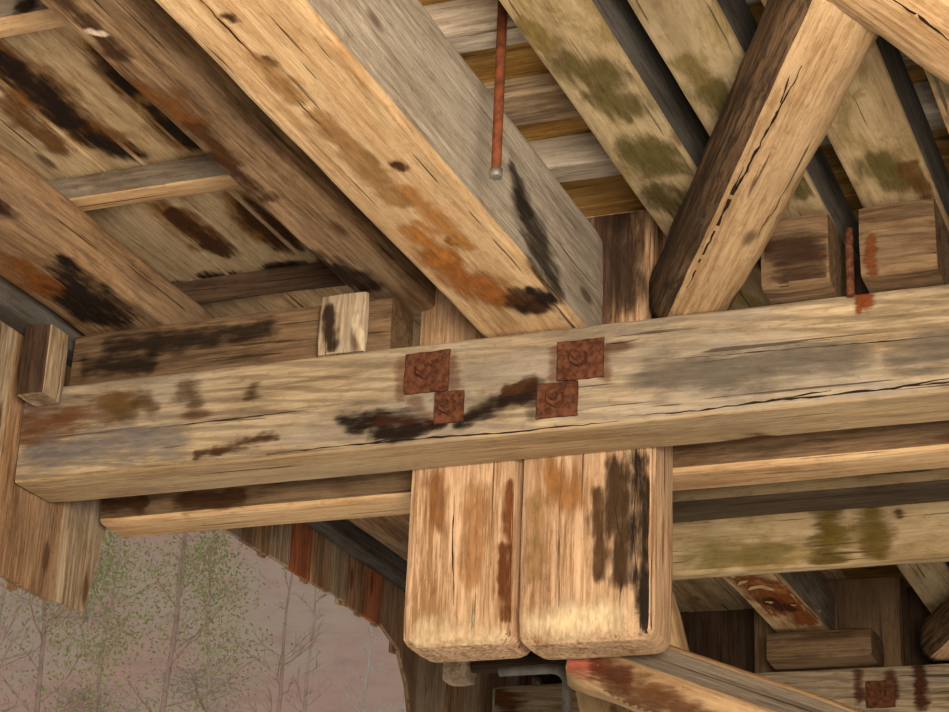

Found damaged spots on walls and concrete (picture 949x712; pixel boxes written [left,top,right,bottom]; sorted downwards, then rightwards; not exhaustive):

leakage [0,41,147,160]
mould [516,16,643,123]
crack [893,0,949,41]
mould [618,135,690,214]
crack [686,66,802,288]
mould [858,152,933,200]
leakage [528,449,653,634]